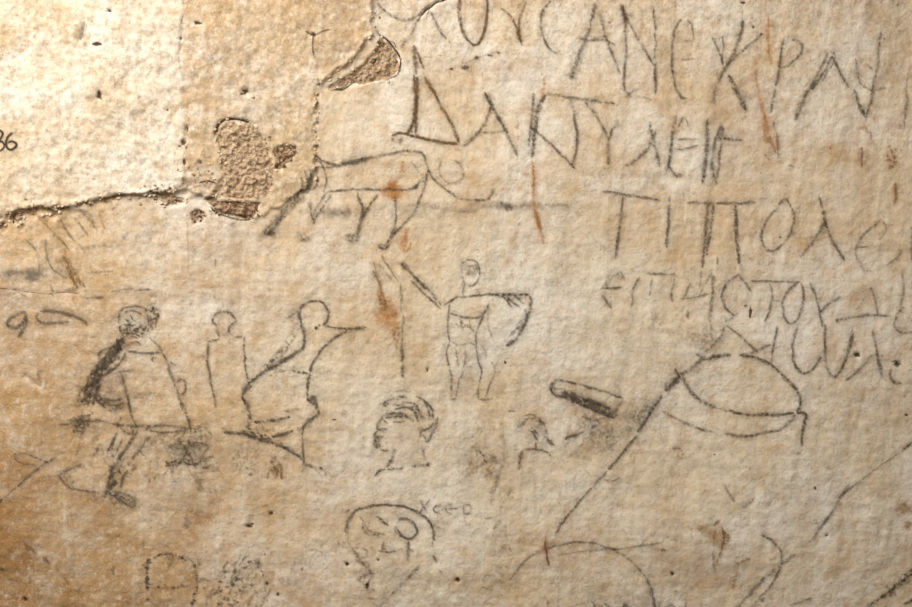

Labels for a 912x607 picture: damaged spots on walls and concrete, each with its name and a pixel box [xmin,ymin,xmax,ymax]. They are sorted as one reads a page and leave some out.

flaking render [312,0,402,167]
flaking render [0,192,105,227]
flaking render [116,118,296,223]